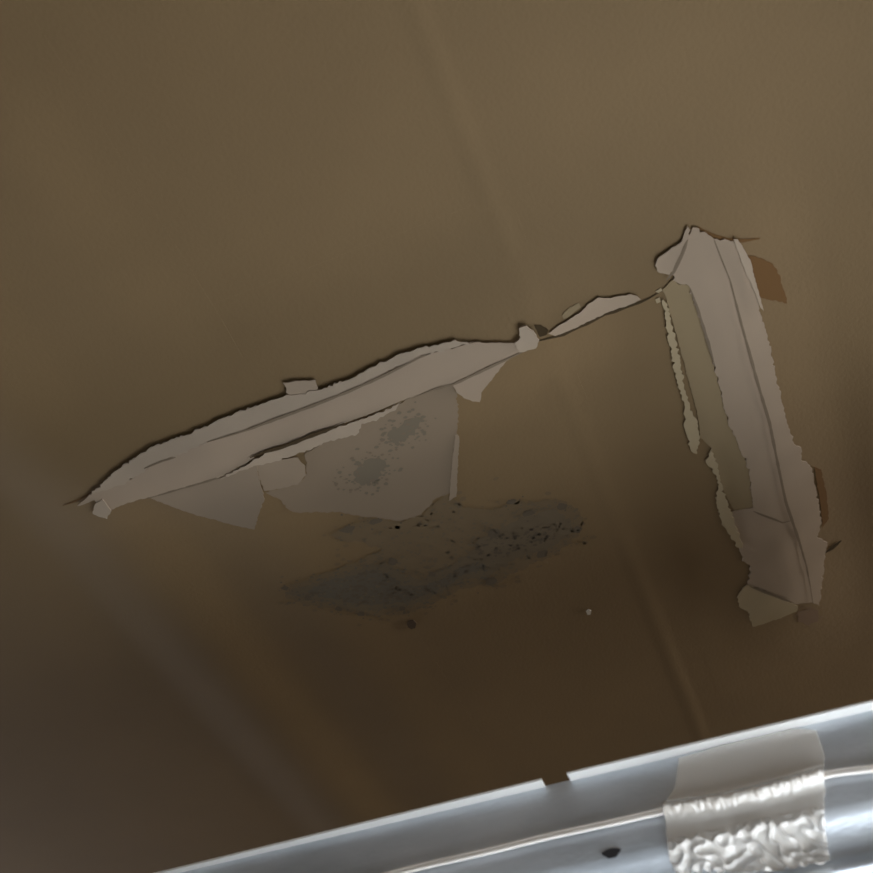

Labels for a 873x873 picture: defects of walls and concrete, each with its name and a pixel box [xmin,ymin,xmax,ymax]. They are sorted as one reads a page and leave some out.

peeling [93,499,111,519]
peeling [149,361,506,530]
water stain [278,491,597,627]
peeling [514,325,539,352]
peeling [548,294,641,336]
crack [412,227,813,603]
peeling [655,226,753,511]
peeling [737,585,798,627]